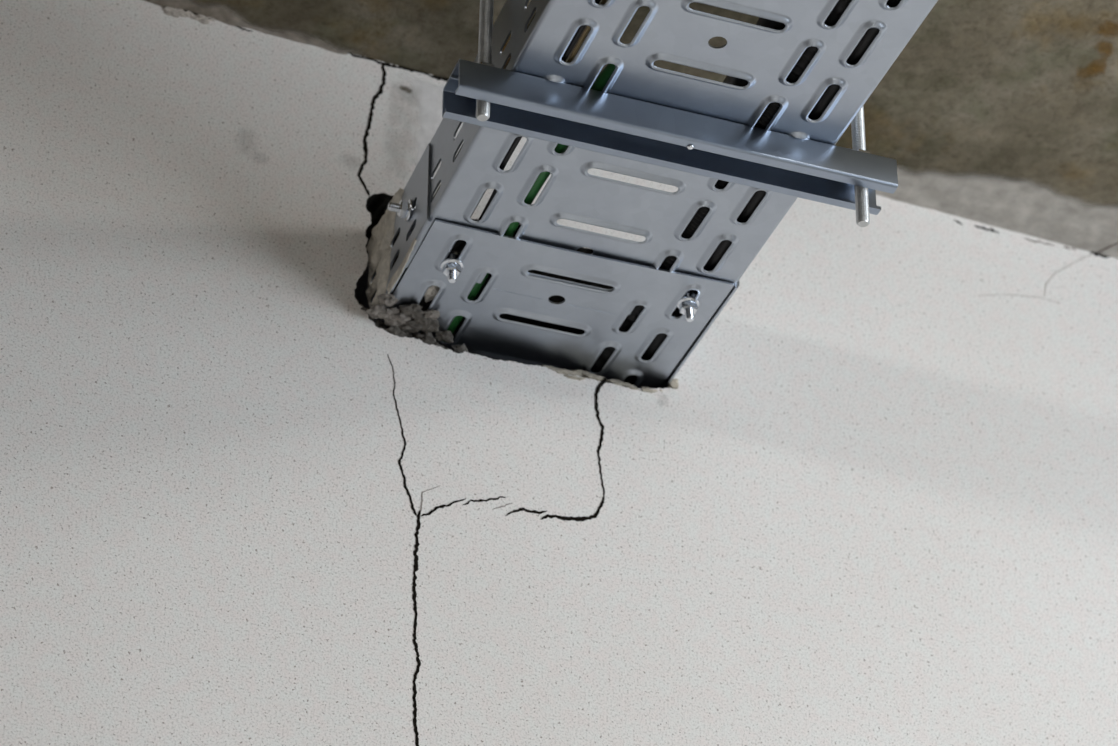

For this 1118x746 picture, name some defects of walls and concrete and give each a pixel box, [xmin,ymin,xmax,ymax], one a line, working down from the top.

crack [347,52,448,196]
spalling [365,193,394,254]
spalling [452,240,466,253]
spalling [528,270,614,289]
spalling [359,296,468,353]
spalling [499,314,585,334]
spalling [541,365,679,393]
crack [388,356,607,746]